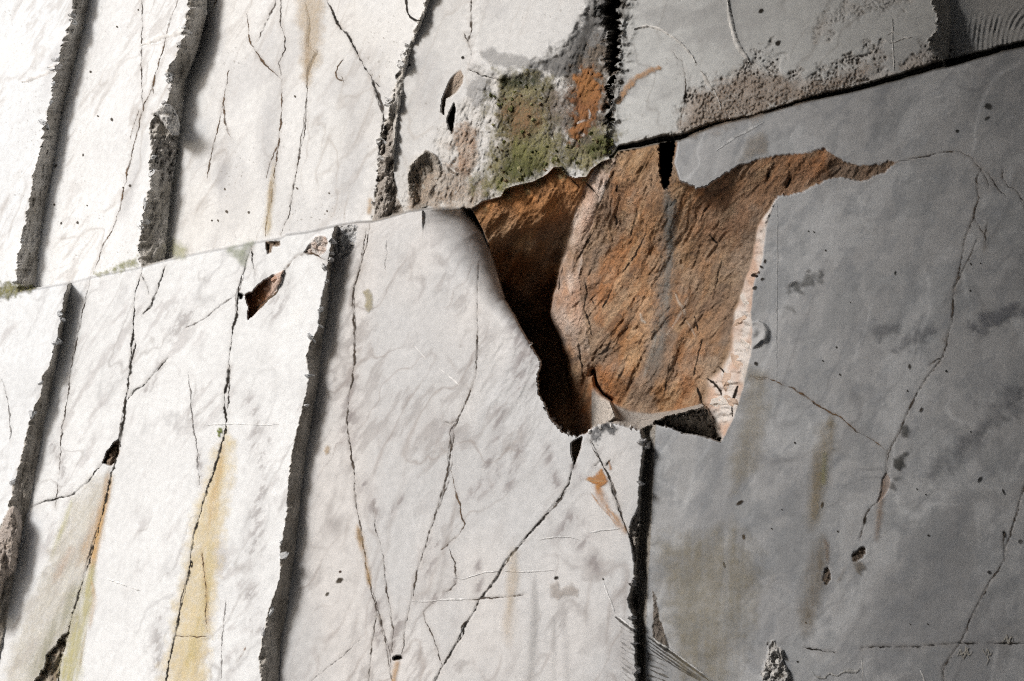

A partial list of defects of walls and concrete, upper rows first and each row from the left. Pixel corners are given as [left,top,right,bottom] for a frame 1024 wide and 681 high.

leakage [467,76,493,106]
leakage [480,0,618,167]
corrosion [567,67,607,143]
crack [38,0,178,681]
leakage [171,457,226,681]
spalling [246,271,284,320]
crack [165,0,384,681]
spalling [259,225,358,681]
crack [311,234,632,681]
corrosion [587,466,611,494]
spalling [472,142,897,681]
crack [753,151,1023,474]